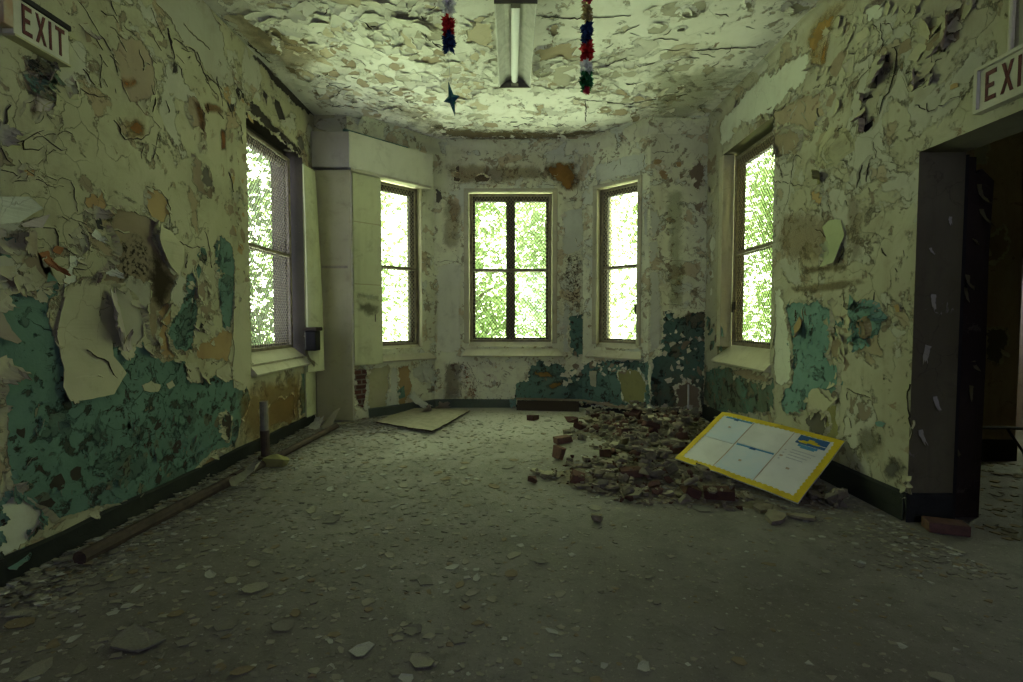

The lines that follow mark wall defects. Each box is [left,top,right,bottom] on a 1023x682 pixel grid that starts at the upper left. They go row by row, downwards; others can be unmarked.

flaking render [23,57,82,120]
crack [1,0,248,319]
spalling [183,94,216,199]
crack [220,16,270,62]
peeling [151,0,695,159]
peeling [643,0,709,35]
peeling [653,0,976,220]
crack [767,0,968,263]
peeling [820,219,845,267]
peeling [0,128,305,570]
flaking render [354,364,413,410]
peeling [512,285,888,440]